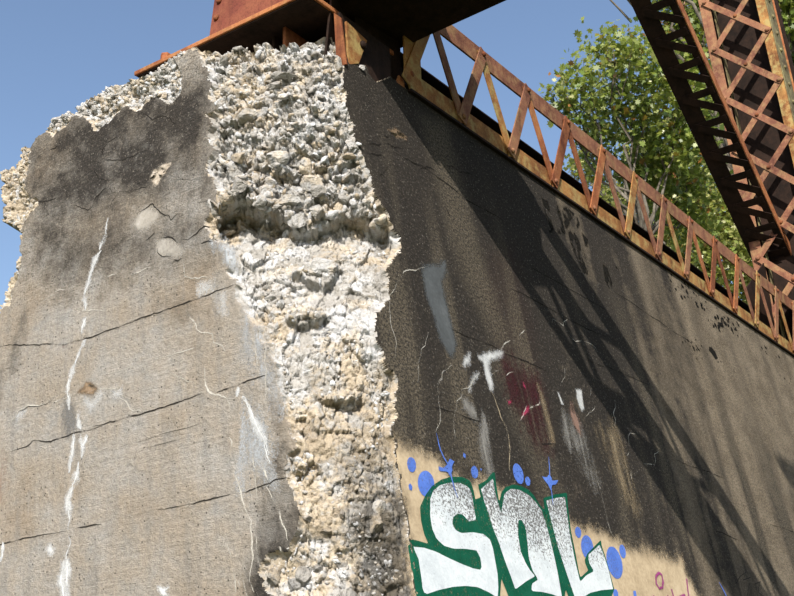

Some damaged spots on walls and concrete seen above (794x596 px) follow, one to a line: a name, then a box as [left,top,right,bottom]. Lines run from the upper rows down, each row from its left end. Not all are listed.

spalling [0,142,39,240]
spalling [0,256,22,315]
crack [2,391,65,433]
leakage [65,243,102,525]
crack [100,309,249,411]
spalling [46,37,415,596]
leakage [59,538,71,596]
crack [219,445,288,595]